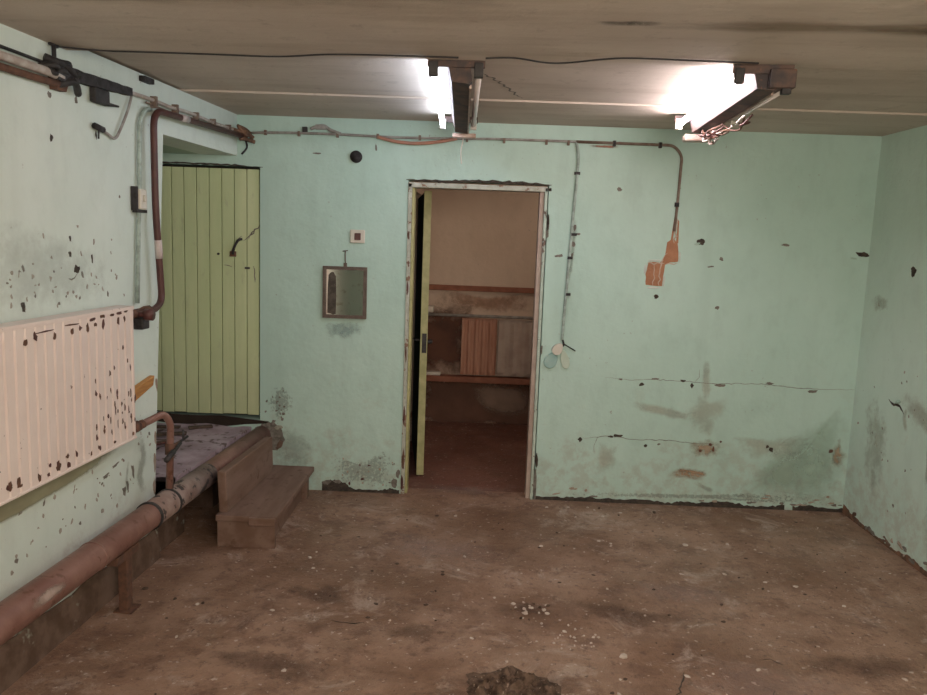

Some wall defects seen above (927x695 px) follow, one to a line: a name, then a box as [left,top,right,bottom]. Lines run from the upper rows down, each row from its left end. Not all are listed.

spalling [644,219,681,289]